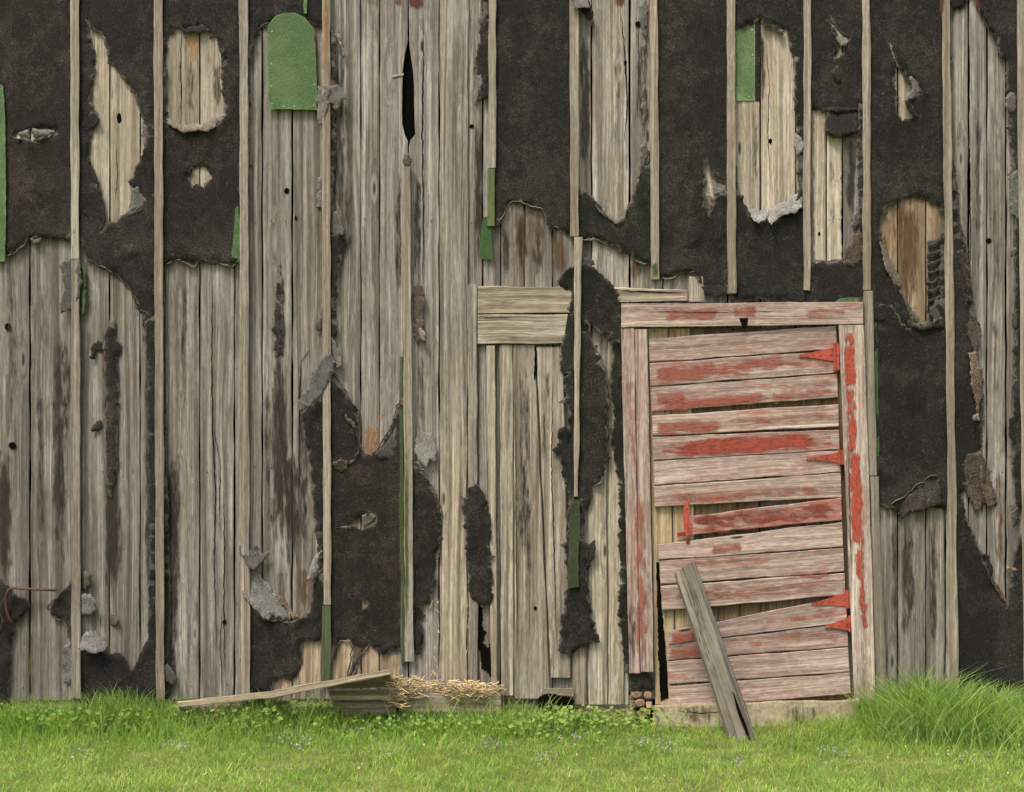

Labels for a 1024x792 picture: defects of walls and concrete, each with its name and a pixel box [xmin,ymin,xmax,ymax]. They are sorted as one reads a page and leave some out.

peeling [86,16,149,232]
peeling [164,25,228,133]
peeling [188,166,212,188]
peeling [602,204,629,224]
peeling [667,285,726,320]
peeling [703,16,863,268]
peeling [889,44,921,121]
peeling [879,196,942,327]
peeling [656,333,868,627]
peeling [634,500,650,651]
peeling [670,633,700,657]